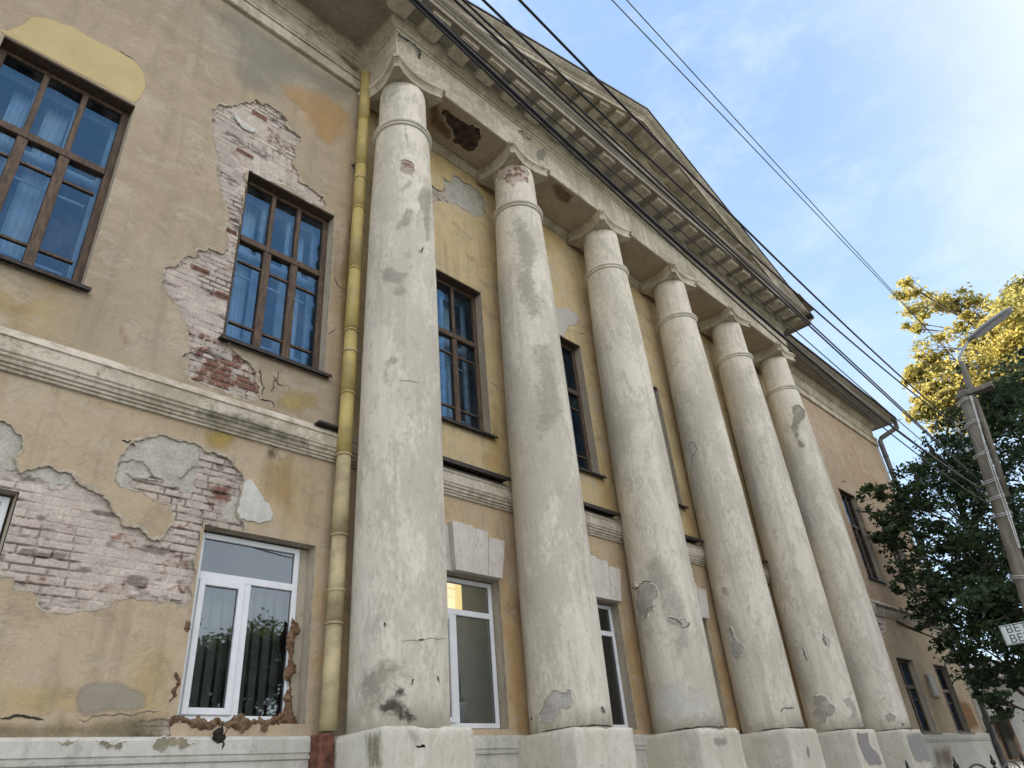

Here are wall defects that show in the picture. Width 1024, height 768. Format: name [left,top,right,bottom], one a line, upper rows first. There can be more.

flaking render [495,164,530,186]
flaking render [399,158,487,239]
flaking render [160,99,326,402]
crack [259,370,283,408]
peeling [792,405,805,447]
flaking render [0,419,249,615]
flaking render [632,581,660,621]
flaking render [666,616,690,628]
spalling [96,618,301,753]
leakage [365,664,415,722]
flaking render [530,687,574,725]
flaking render [812,693,857,725]